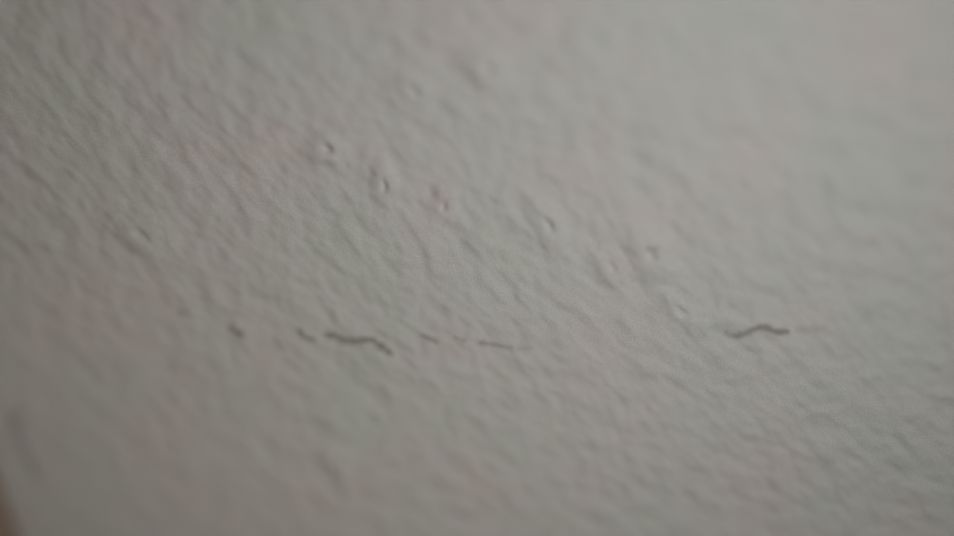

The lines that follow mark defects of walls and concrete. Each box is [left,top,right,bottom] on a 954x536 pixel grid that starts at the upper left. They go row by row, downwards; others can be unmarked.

crack [751,325,788,334]
crack [297,330,391,355]